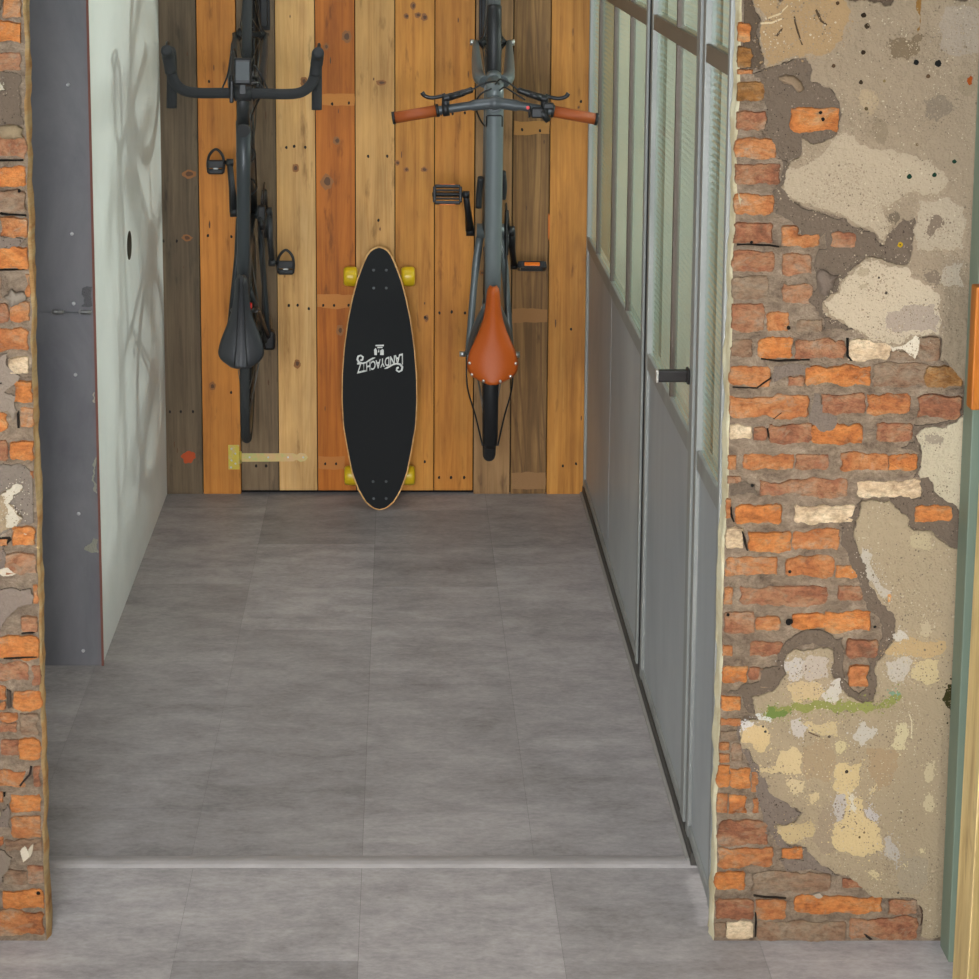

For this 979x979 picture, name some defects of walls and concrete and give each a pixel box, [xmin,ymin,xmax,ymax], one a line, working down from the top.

spalling [0,71,24,126]
spalling [0,236,26,249]
spalling [0,353,20,422]
flaking render [727,0,979,939]
spalling [0,463,34,629]
spalling [0,844,33,896]